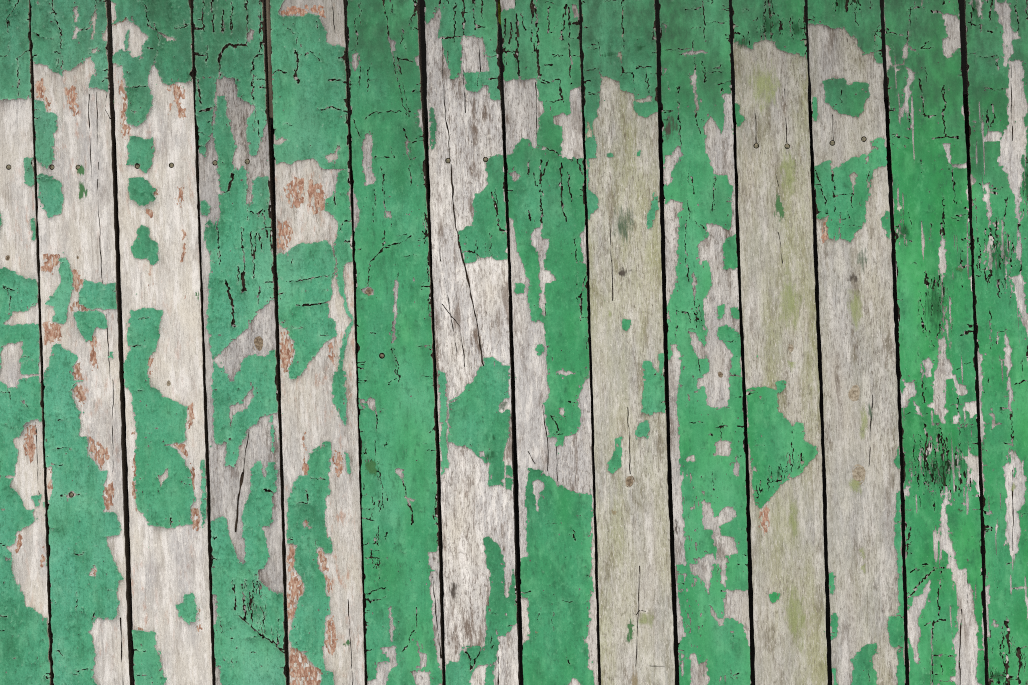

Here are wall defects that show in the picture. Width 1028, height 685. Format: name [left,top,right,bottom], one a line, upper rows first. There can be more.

crack [144,0,369,112]
crack [854,0,945,49]
crack [897,80,959,139]
crack [971,0,1027,161]
crack [227,210,268,327]
crack [289,276,327,307]
peeling [0,0,675,685]
crack [321,0,595,365]
crack [607,228,615,300]
peeling [659,0,1028,685]
crack [940,172,1022,277]
crack [1009,470,1017,549]